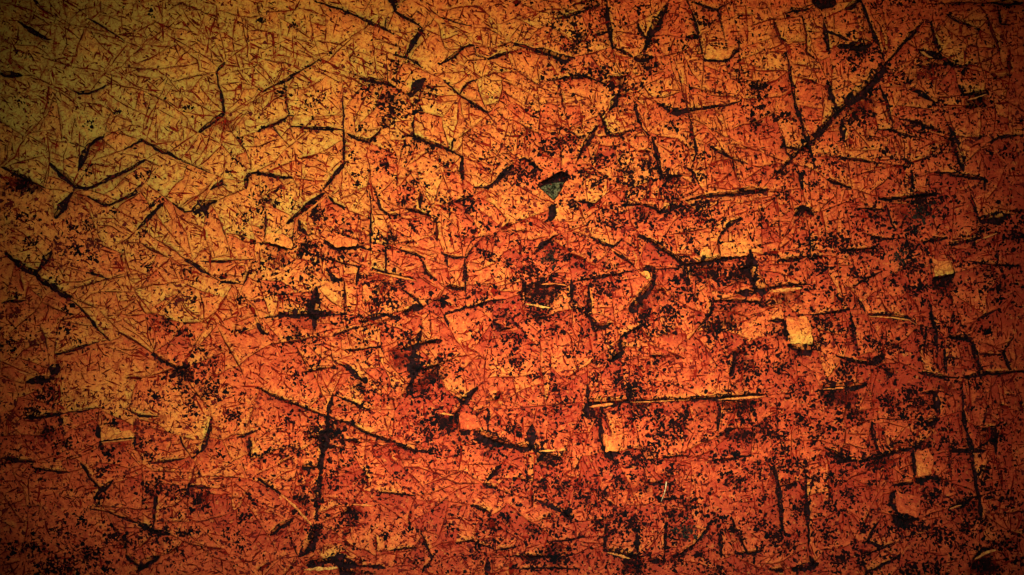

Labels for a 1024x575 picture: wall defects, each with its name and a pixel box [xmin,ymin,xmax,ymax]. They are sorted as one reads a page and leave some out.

crack [758,0,776,15]
peeling [932,258,954,289]
peeling [769,287,813,344]
crack [294,347,309,373]
crack [781,372,830,416]
crack [1,548,42,575]